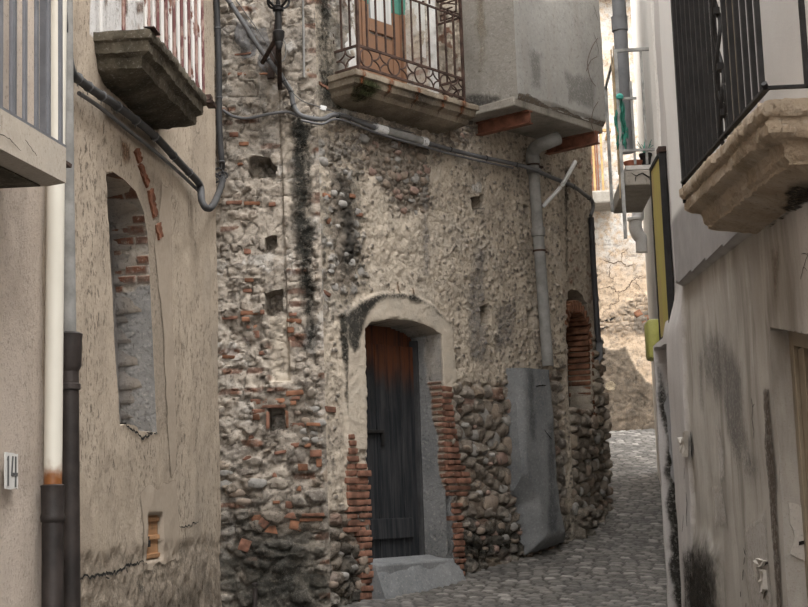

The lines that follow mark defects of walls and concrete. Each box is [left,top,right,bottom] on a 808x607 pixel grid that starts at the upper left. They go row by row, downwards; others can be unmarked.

spalling [133,148,164,240]
water stain [291,118,317,354]
mould [770,186,808,227]
mould [340,294,421,399]
water stain [658,374,714,607]
crack [80,560,147,580]